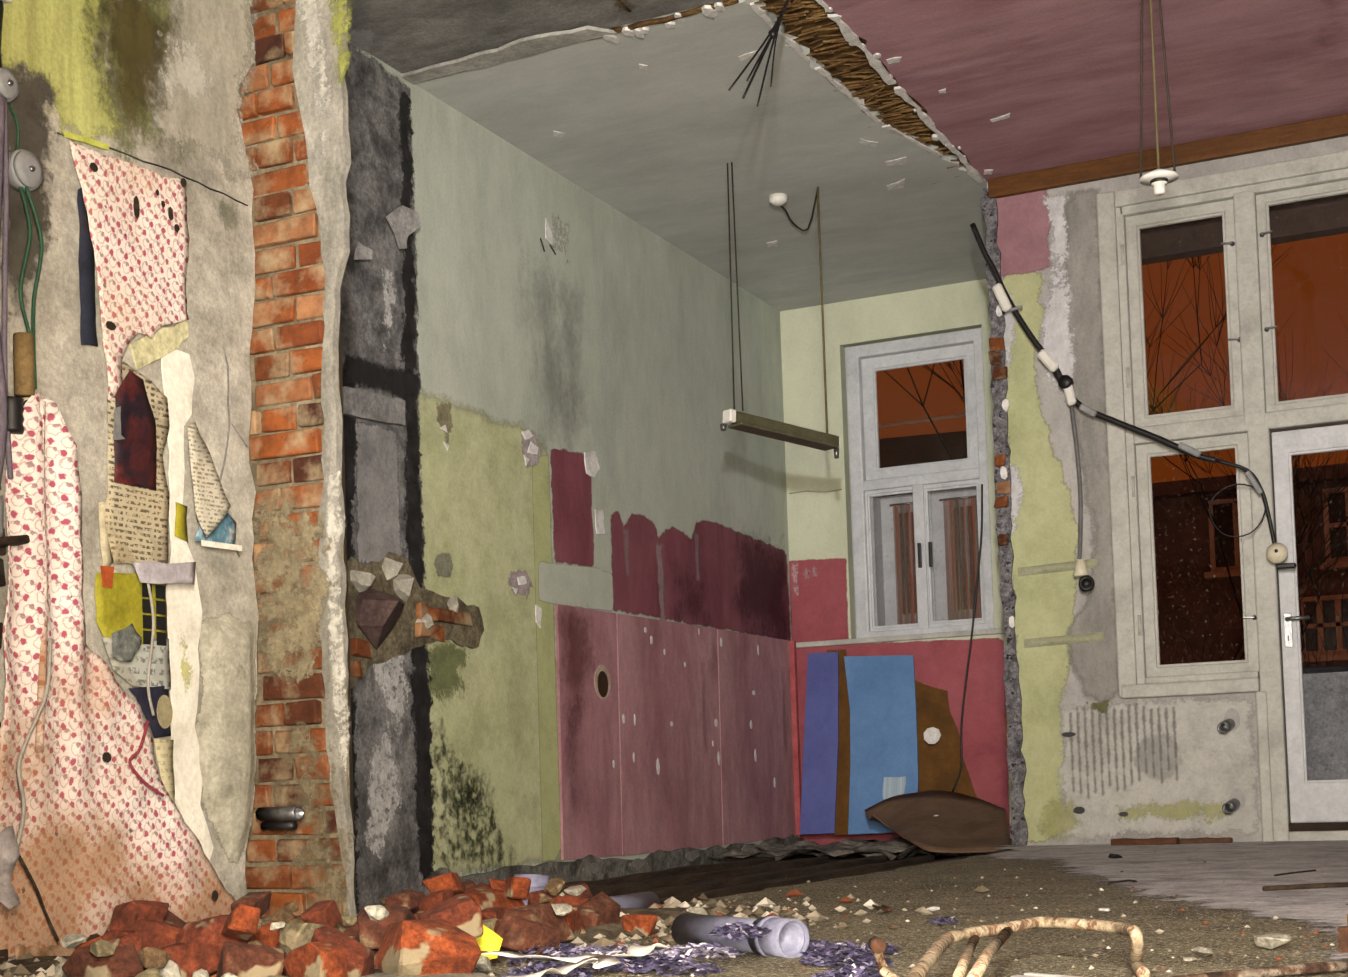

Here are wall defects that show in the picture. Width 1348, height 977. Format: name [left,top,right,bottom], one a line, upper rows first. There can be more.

leakage [87,0,184,117]
peeling [0,0,804,977]
leakage [430,734,503,874]
flaking render [750,0,1028,847]